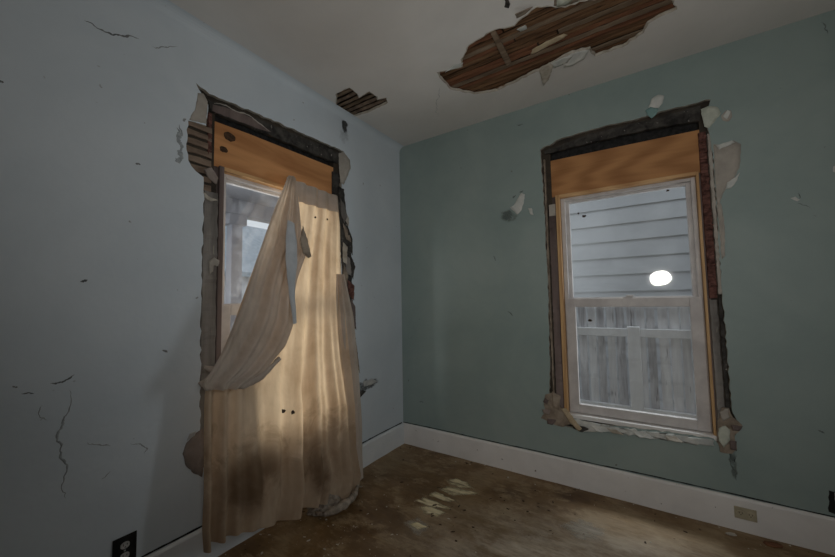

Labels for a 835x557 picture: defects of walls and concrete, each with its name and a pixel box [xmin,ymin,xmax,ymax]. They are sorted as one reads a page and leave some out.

crack [84,20,177,48]
spalling [437,0,677,94]
spalling [336,88,388,117]
peeling [645,95,664,119]
peeling [701,106,732,128]
spalling [175,93,218,202]
peeling [503,191,533,220]
spalling [541,392,570,427]
crack [12,374,75,497]
spalling [717,407,743,454]